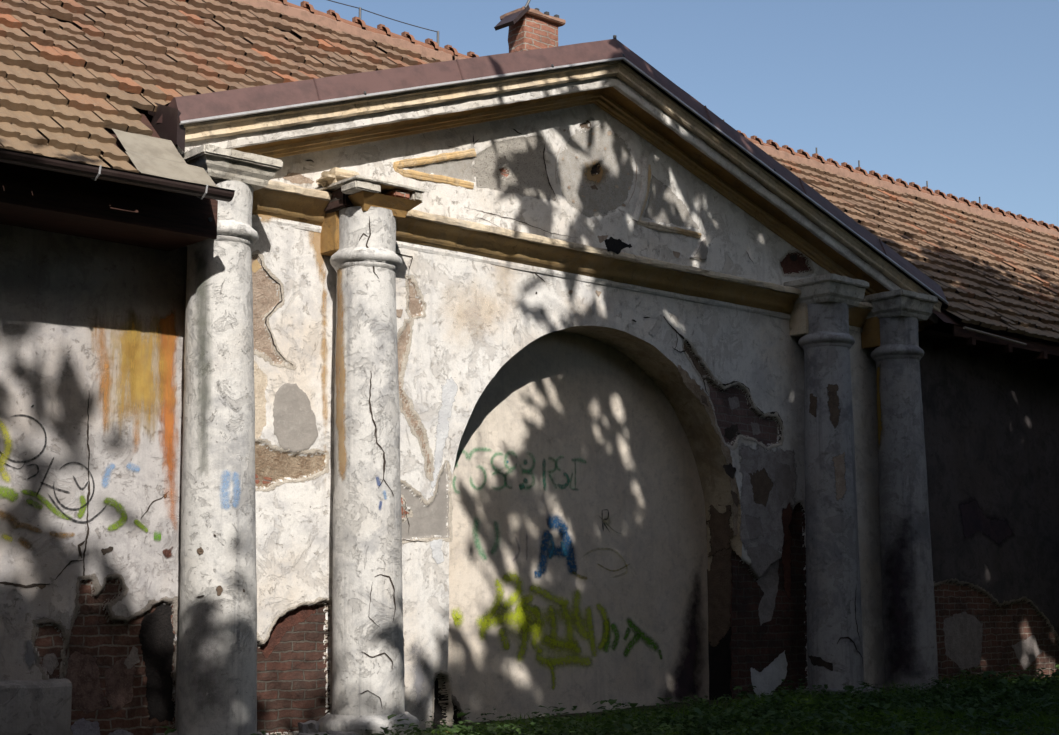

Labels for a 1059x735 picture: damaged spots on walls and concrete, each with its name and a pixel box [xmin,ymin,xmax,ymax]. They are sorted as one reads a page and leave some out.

crack [55,393,113,582]
flaking render [25,574,179,735]
crack [163,547,173,558]
flaking render [251,250,330,492]
flaking render [257,597,332,735]
crack [369,373,394,496]
crack [369,574,396,626]
flaking render [396,253,453,544]
damp [665,582,701,703]
crack [664,317,783,440]
flaking render [678,365,808,702]
flaking render [933,578,1059,683]